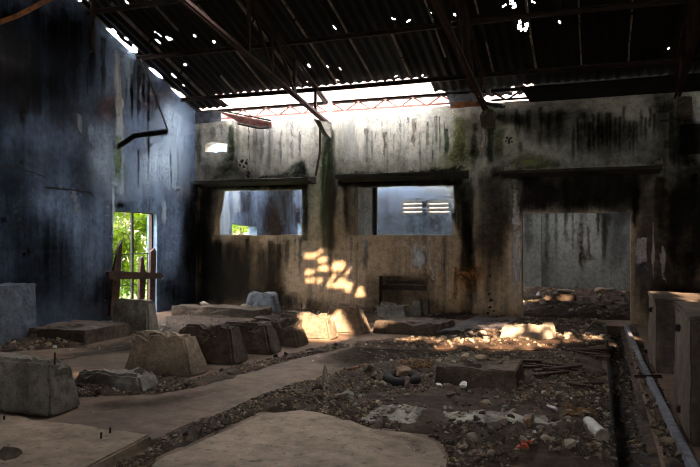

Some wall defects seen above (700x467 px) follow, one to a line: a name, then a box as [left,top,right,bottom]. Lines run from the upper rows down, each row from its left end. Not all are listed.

crack [0,166,96,199]
leakage [86,37,179,233]
leakage [321,142,348,273]
leakage [596,192,639,250]